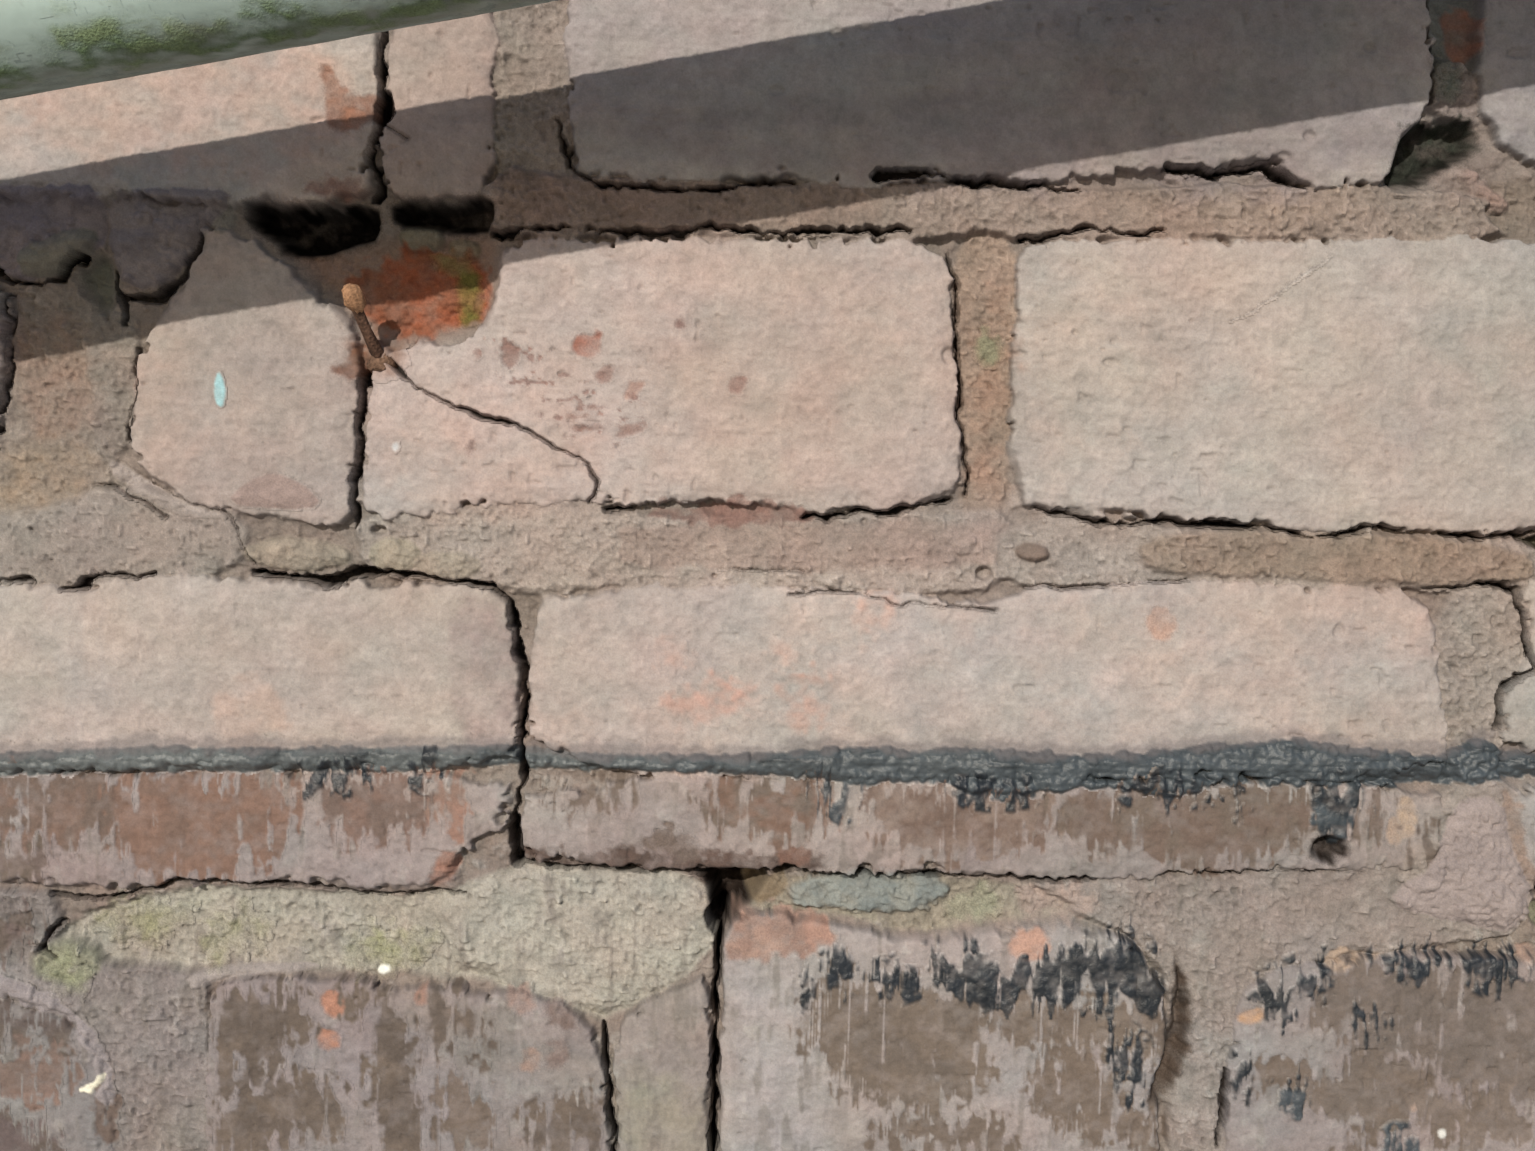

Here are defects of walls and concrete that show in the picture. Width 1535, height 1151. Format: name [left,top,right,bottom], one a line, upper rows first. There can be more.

crack [362,31,411,204]
corrosion [339,318,419,386]
crack [348,356,601,529]
crack [215,506,531,868]
peeling [0,767,479,973]
peeling [0,995,124,1151]
crack [601,1020,618,1151]
crack [705,889,727,1151]
damp [791,942,924,1027]
peeling [523,768,1446,1151]
damp [1089,1018,1157,1115]
peeling [1243,941,1535,1151]